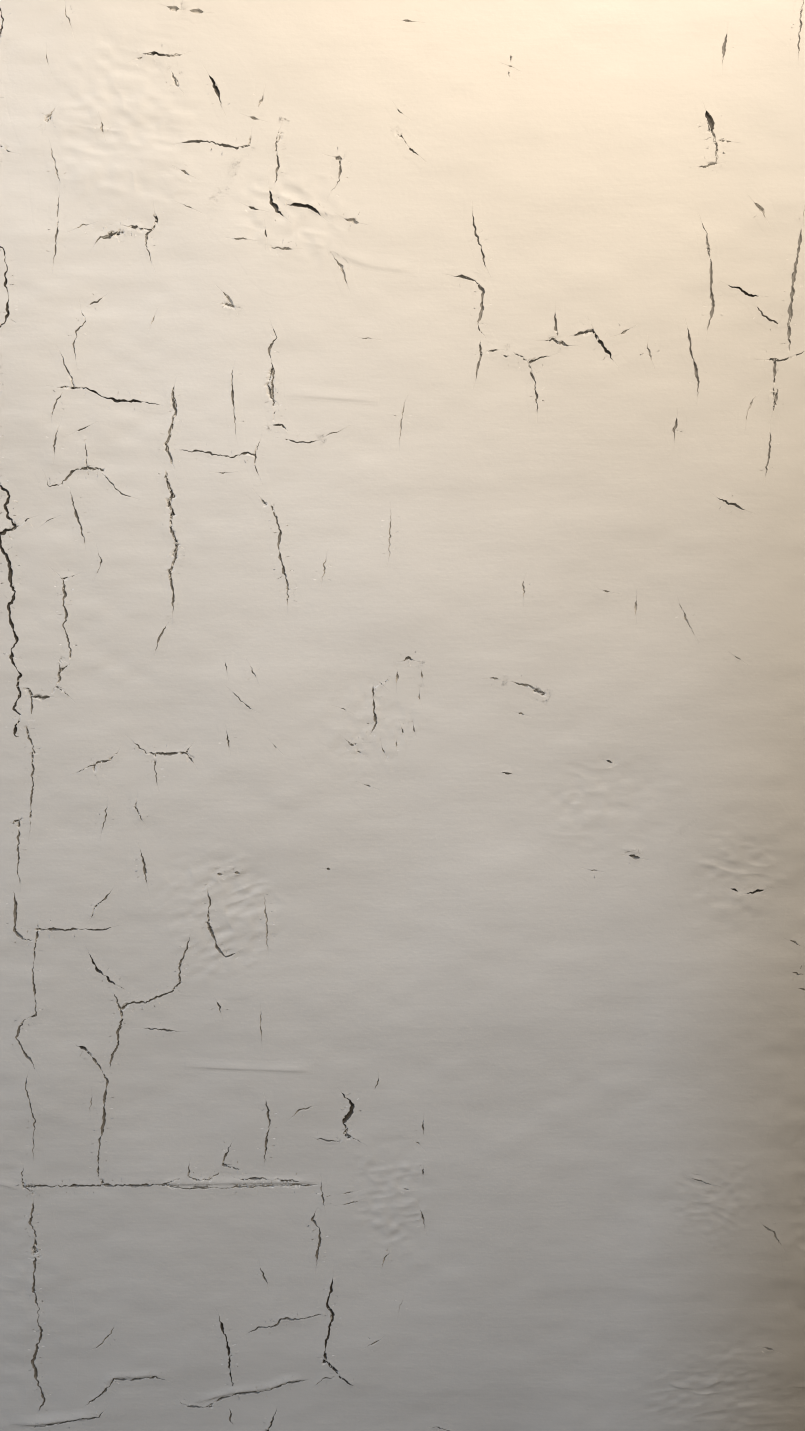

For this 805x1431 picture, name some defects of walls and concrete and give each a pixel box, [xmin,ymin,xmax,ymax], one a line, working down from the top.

crack [441,21,805,522]
crack [788,0,805,68]
crack [0,0,433,1431]